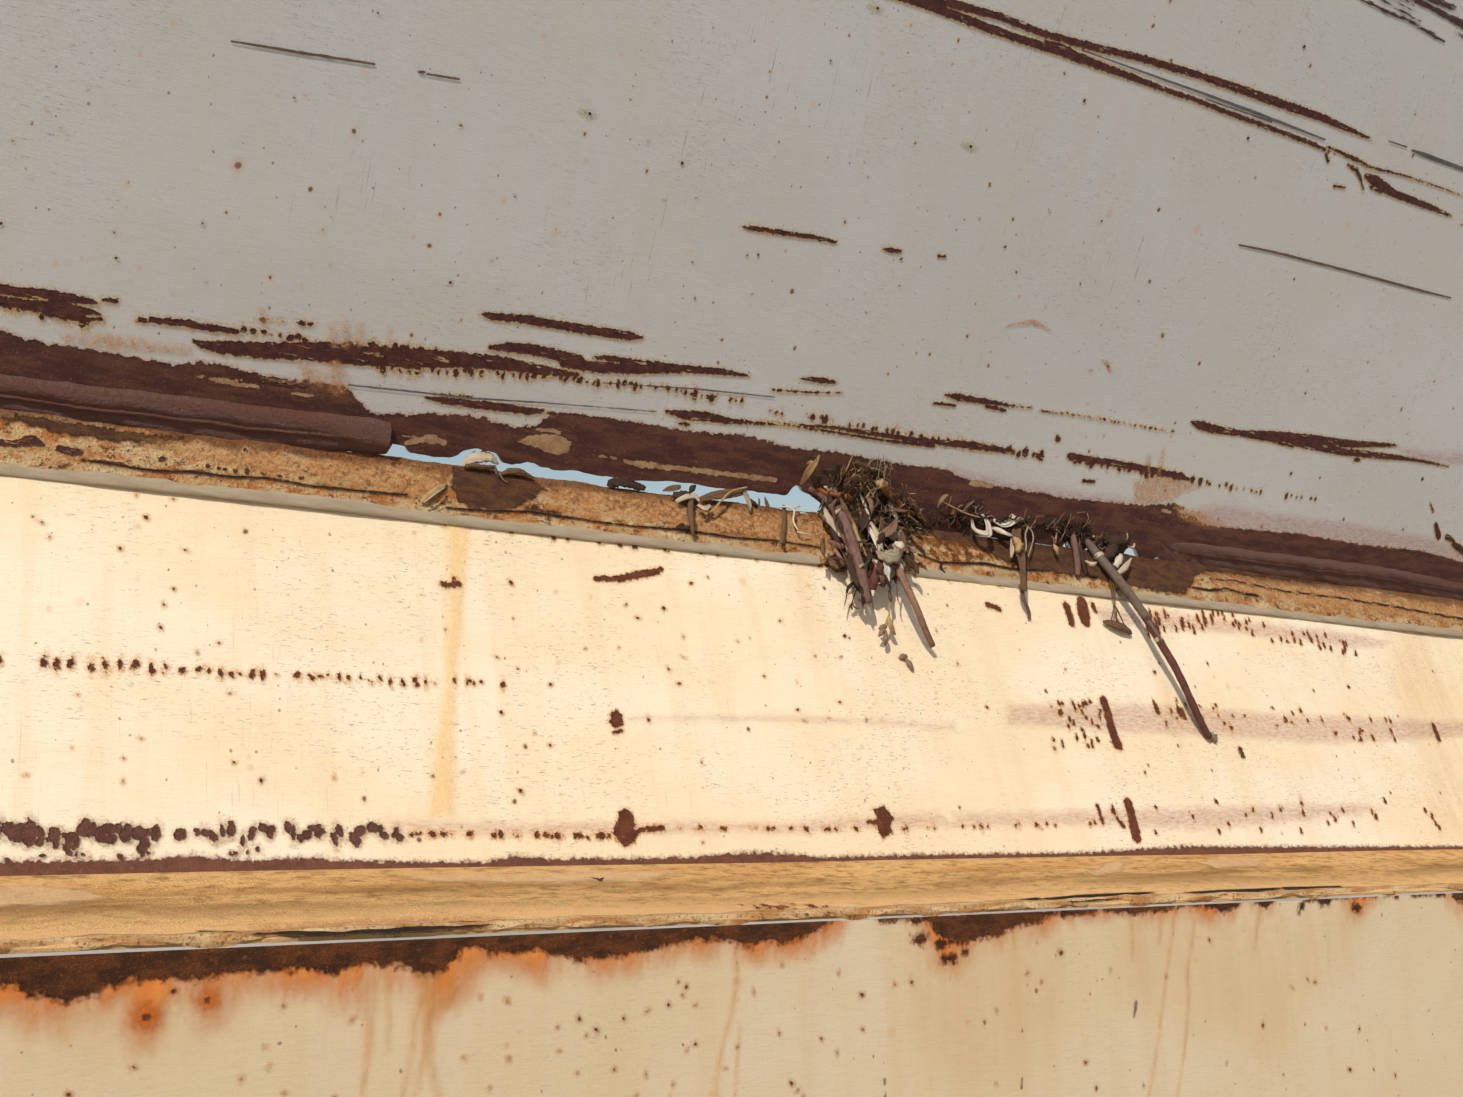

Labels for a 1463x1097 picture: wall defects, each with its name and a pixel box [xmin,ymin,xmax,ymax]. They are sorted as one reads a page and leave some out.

peeling [1364,173,1451,217]
spalling [138,316,317,343]
peeling [424,393,572,455]
peeling [537,373,804,428]
peeling [933,393,1176,432]
corrosion [0,330,1463,622]
peeling [1063,596,1098,627]
corrosion [609,709,624,734]
corrosion [0,805,1463,881]
corrosion [1298,893,1463,916]
corrosion [878,901,1274,965]
corrosion [0,902,842,1034]